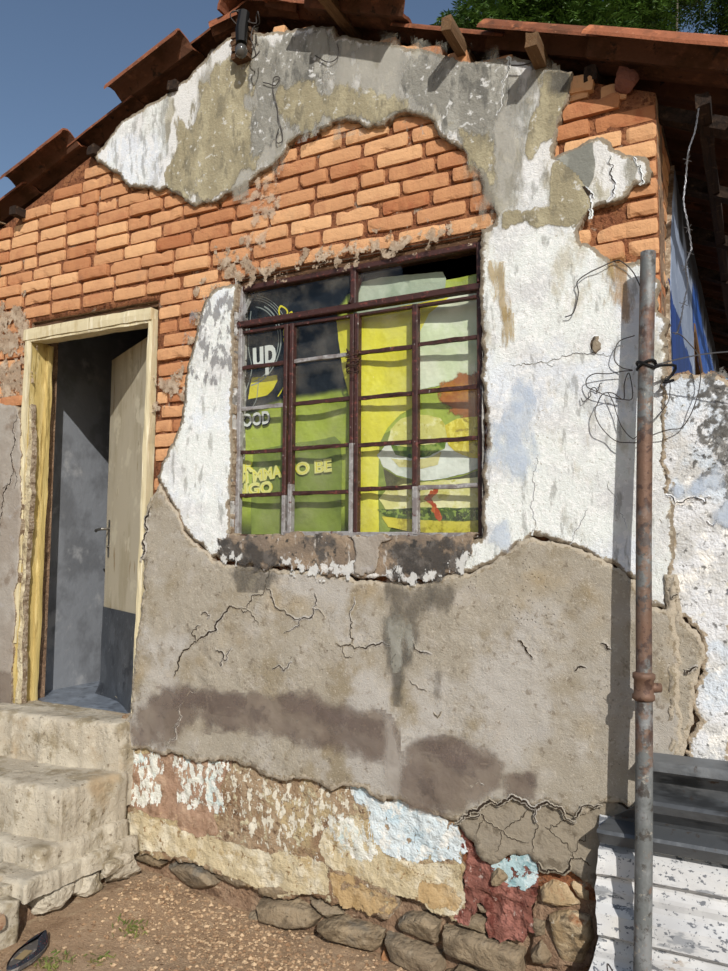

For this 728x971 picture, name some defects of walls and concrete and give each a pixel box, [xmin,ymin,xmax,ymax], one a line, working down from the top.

spalling [208,10,238,44]
spalling [0,116,496,461]
water stain [215,538,359,593]
crack [165,567,432,746]
water stain [131,687,535,814]
crack [409,679,442,719]
water stain [383,536,472,703]
peeling [126,750,599,970]
crack [454,782,630,889]